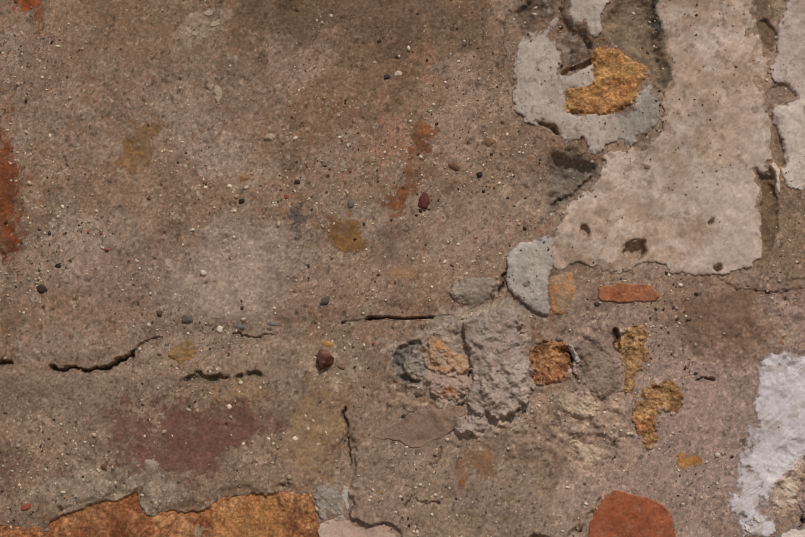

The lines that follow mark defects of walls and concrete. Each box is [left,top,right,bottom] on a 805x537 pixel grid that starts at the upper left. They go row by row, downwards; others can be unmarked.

peeling [506,0,805,315]
rust [0,130,22,261]
crack [345,314,454,323]
crack [47,336,164,375]
peeling [781,515,805,537]